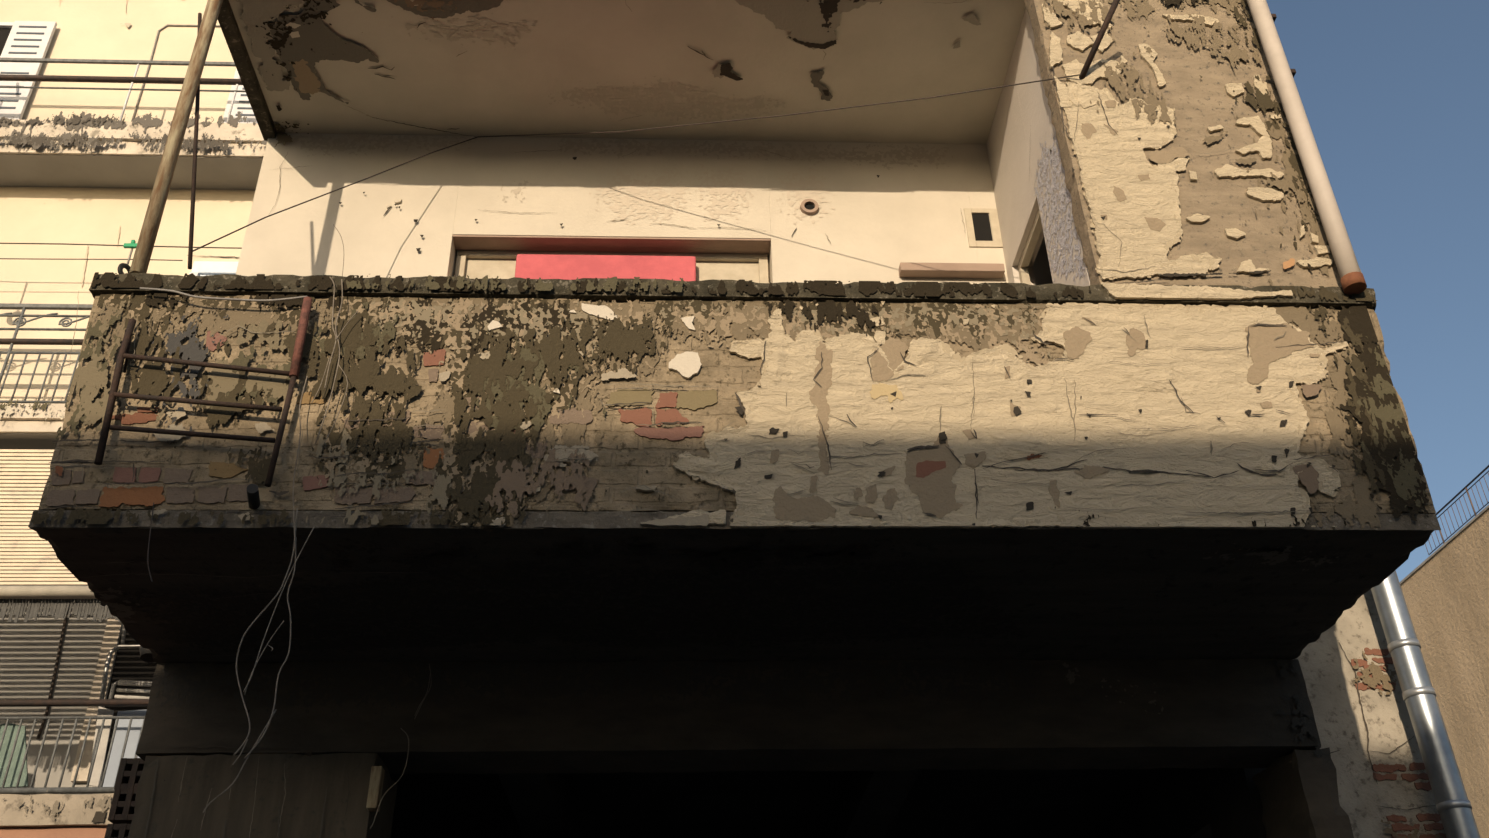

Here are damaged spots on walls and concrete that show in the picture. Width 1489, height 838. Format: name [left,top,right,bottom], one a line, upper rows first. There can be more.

spalling [735,0,884,50]
peeling [235,0,503,104]
spalling [712,63,743,81]
spalling [810,70,833,101]
water stain [0,105,421,157]
water stain [1100,0,1429,527]
water stain [0,246,1091,526]
crack [597,221,1345,519]
flaking render [618,389,717,441]
peeling [764,337,986,522]
flaking render [45,470,165,508]
flaking render [1351,647,1396,691]